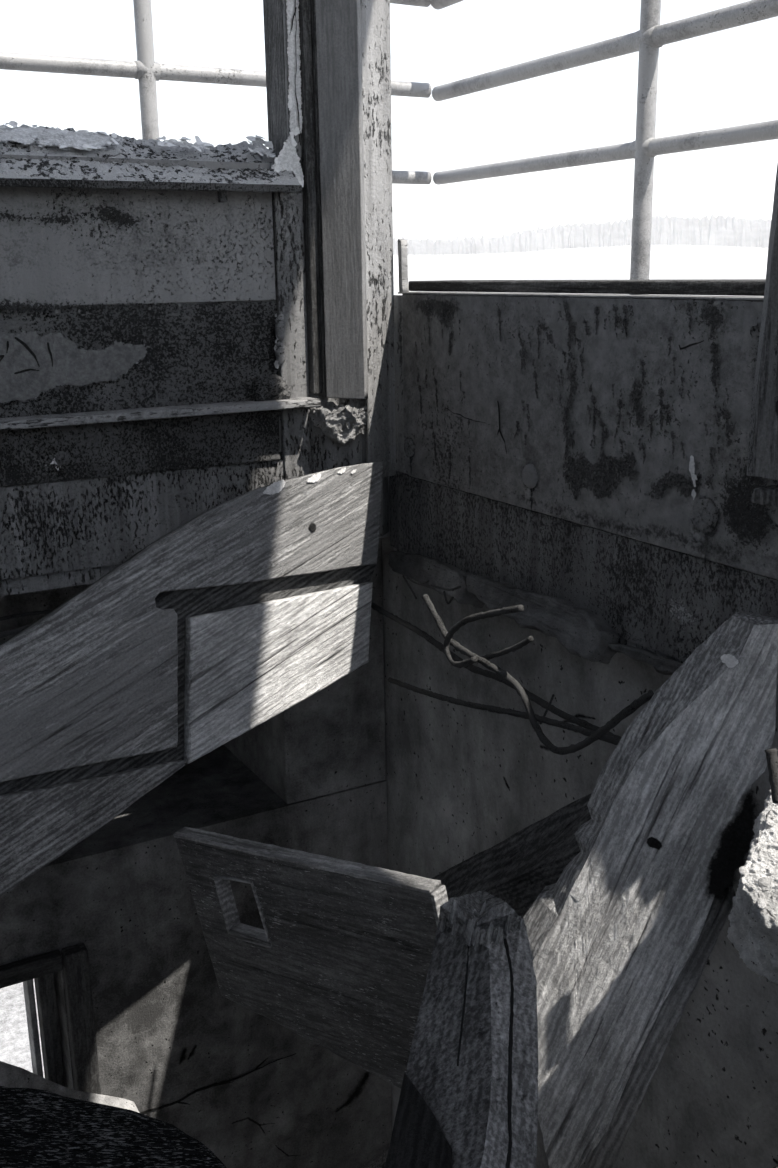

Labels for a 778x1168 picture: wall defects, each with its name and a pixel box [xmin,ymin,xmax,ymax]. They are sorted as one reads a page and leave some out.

peeling [0,121,125,151]
peeling [157,135,214,152]
peeling [0,296,181,315]
peeling [0,330,150,403]
rust [398,293,462,480]
rust [686,301,736,446]
spalling [309,401,388,445]
rust [514,457,778,562]
crack [140,1053,296,1114]